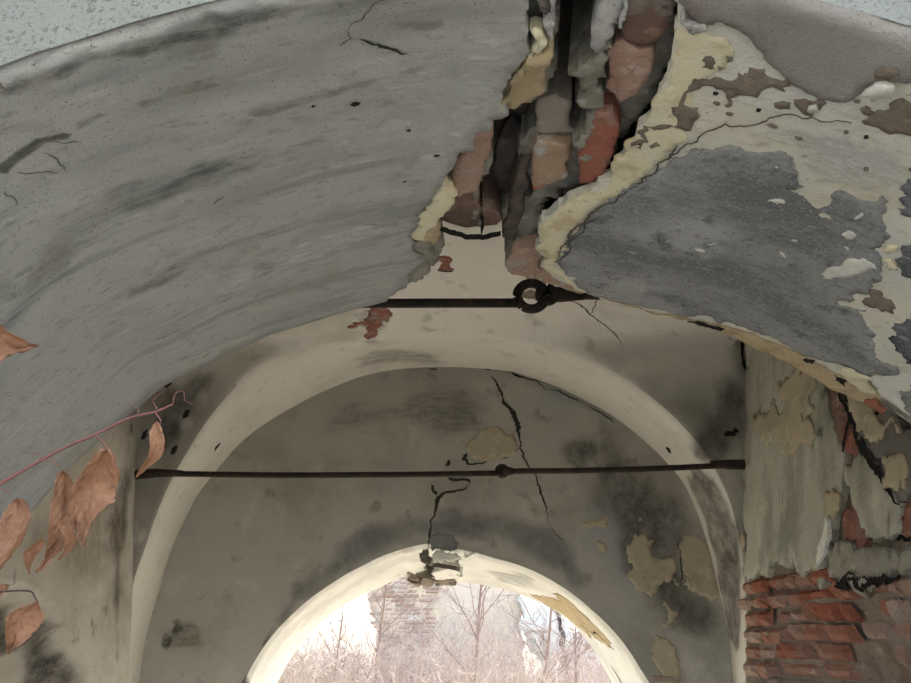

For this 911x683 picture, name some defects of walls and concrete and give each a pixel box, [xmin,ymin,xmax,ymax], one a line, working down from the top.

crack [341,0,384,45]
crack [17,140,82,174]
spalling [408,0,911,294]
crack [555,113,851,264]
crack [427,369,613,549]
damp [23,625,71,683]
spalling [530,593,611,660]
damp [612,481,677,559]
peeling [626,534,721,602]
damp [658,574,709,627]
damp [690,470,740,647]
flaking render [737,488,911,683]